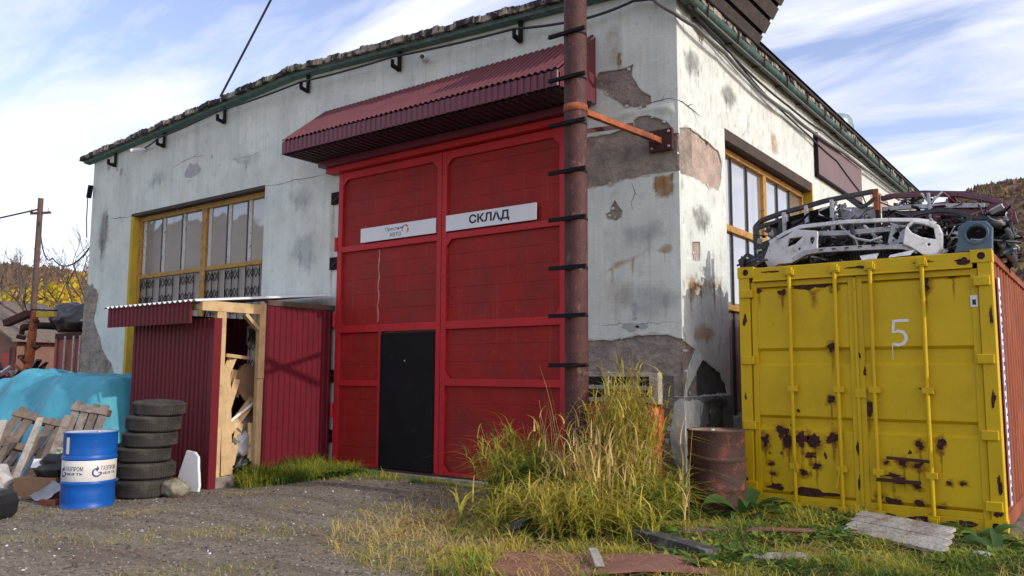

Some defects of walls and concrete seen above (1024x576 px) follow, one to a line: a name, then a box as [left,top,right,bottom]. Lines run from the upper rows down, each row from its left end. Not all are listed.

flaking render [587,63,722,191]
crack [651,94,700,117]
flaking render [605,200,623,221]
flaking render [588,317,727,492]
rust [761,425,840,511]
rust [875,437,979,528]